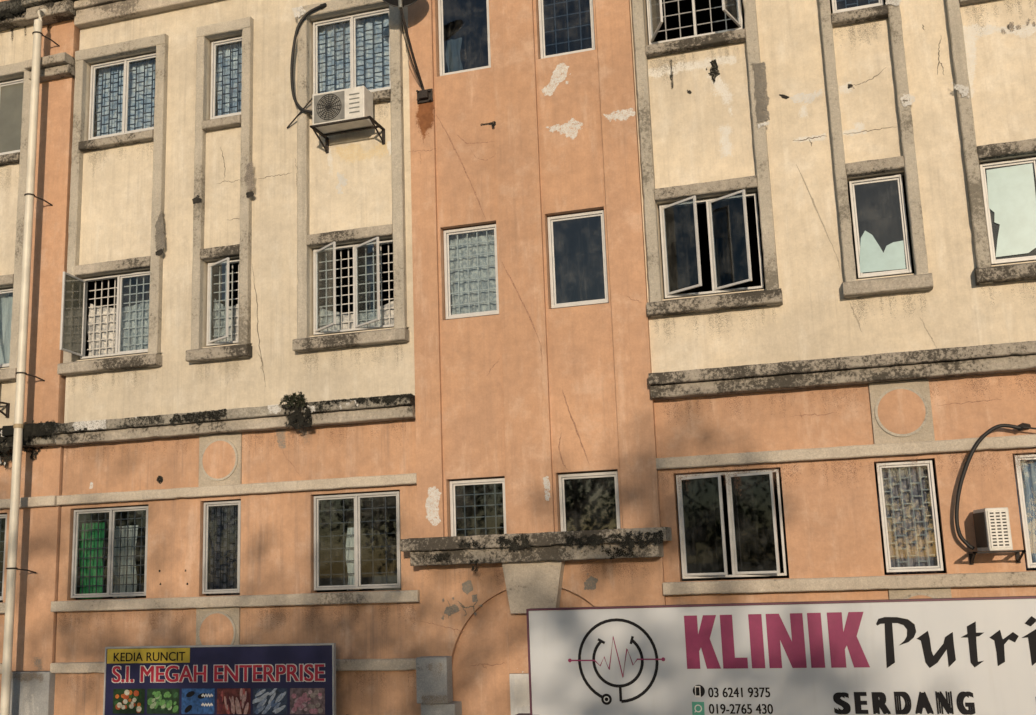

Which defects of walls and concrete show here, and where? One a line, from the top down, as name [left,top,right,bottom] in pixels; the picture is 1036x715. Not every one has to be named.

peeling [542,63,570,96]
peeling [546,118,583,139]
peeling [603,108,636,122]
crack [502,263,543,364]
leakage [0,420,57,470]
leakage [169,409,227,425]
leakage [242,393,413,454]
crack [558,390,589,469]
peeling [425,486,441,526]
leakage [422,533,532,590]
leakage [563,530,667,583]